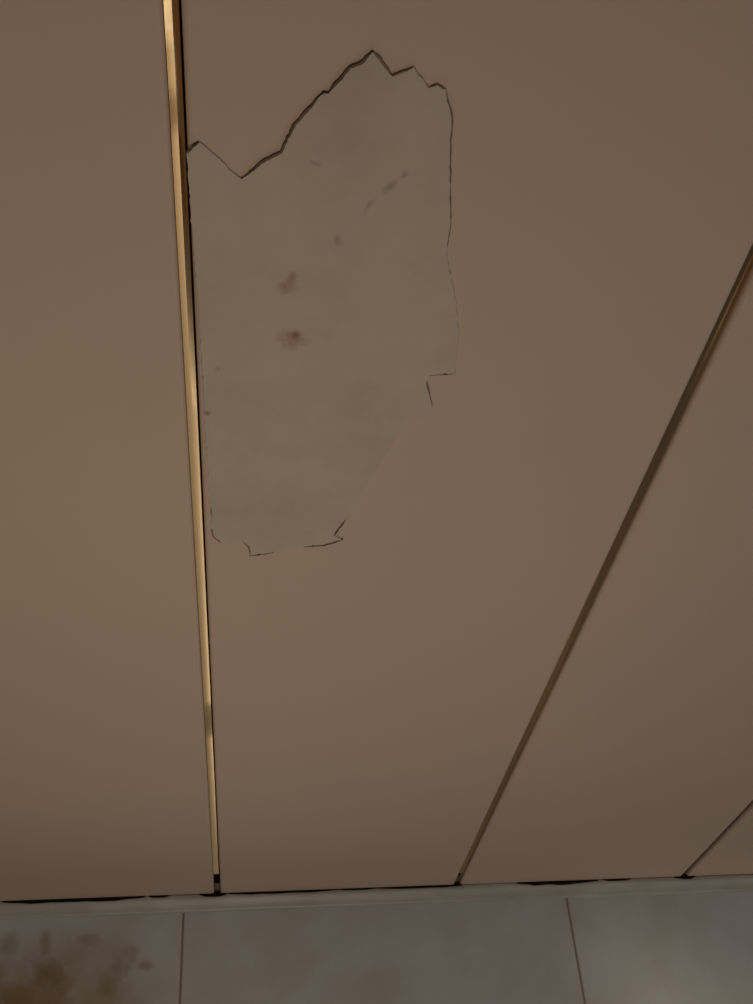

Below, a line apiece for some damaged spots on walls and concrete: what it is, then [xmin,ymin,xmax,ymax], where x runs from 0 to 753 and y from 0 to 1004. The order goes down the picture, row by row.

peeling [186,50,459,556]